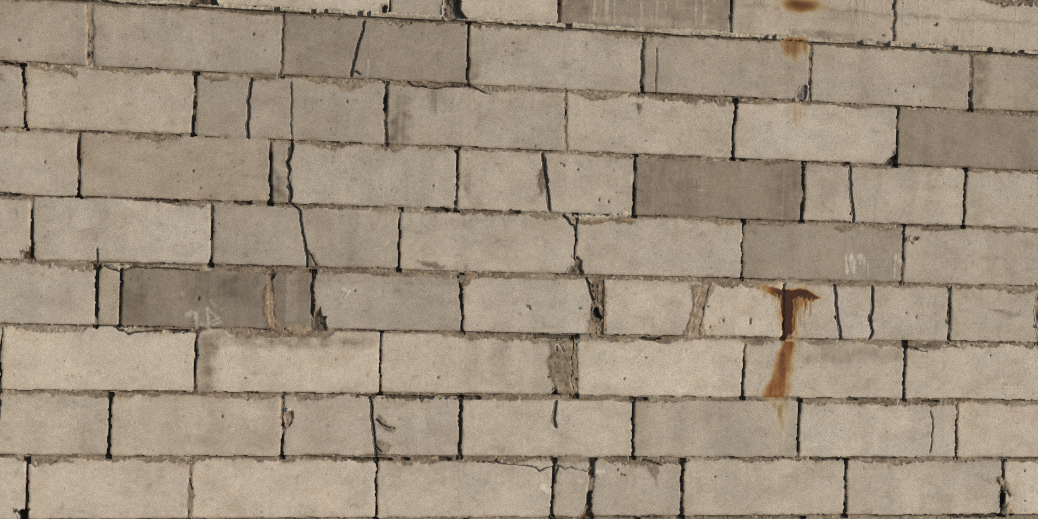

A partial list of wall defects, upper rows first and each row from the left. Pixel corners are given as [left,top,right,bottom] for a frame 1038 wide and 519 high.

spalling [438,0,469,23]
rust [760,0,844,21]
crack [351,21,365,76]
rust [766,35,813,69]
crack [286,85,317,266]
crack [542,154,576,230]
crack [834,285,842,338]
crack [867,287,875,339]
rust [746,281,833,458]
crack [477,461,588,482]